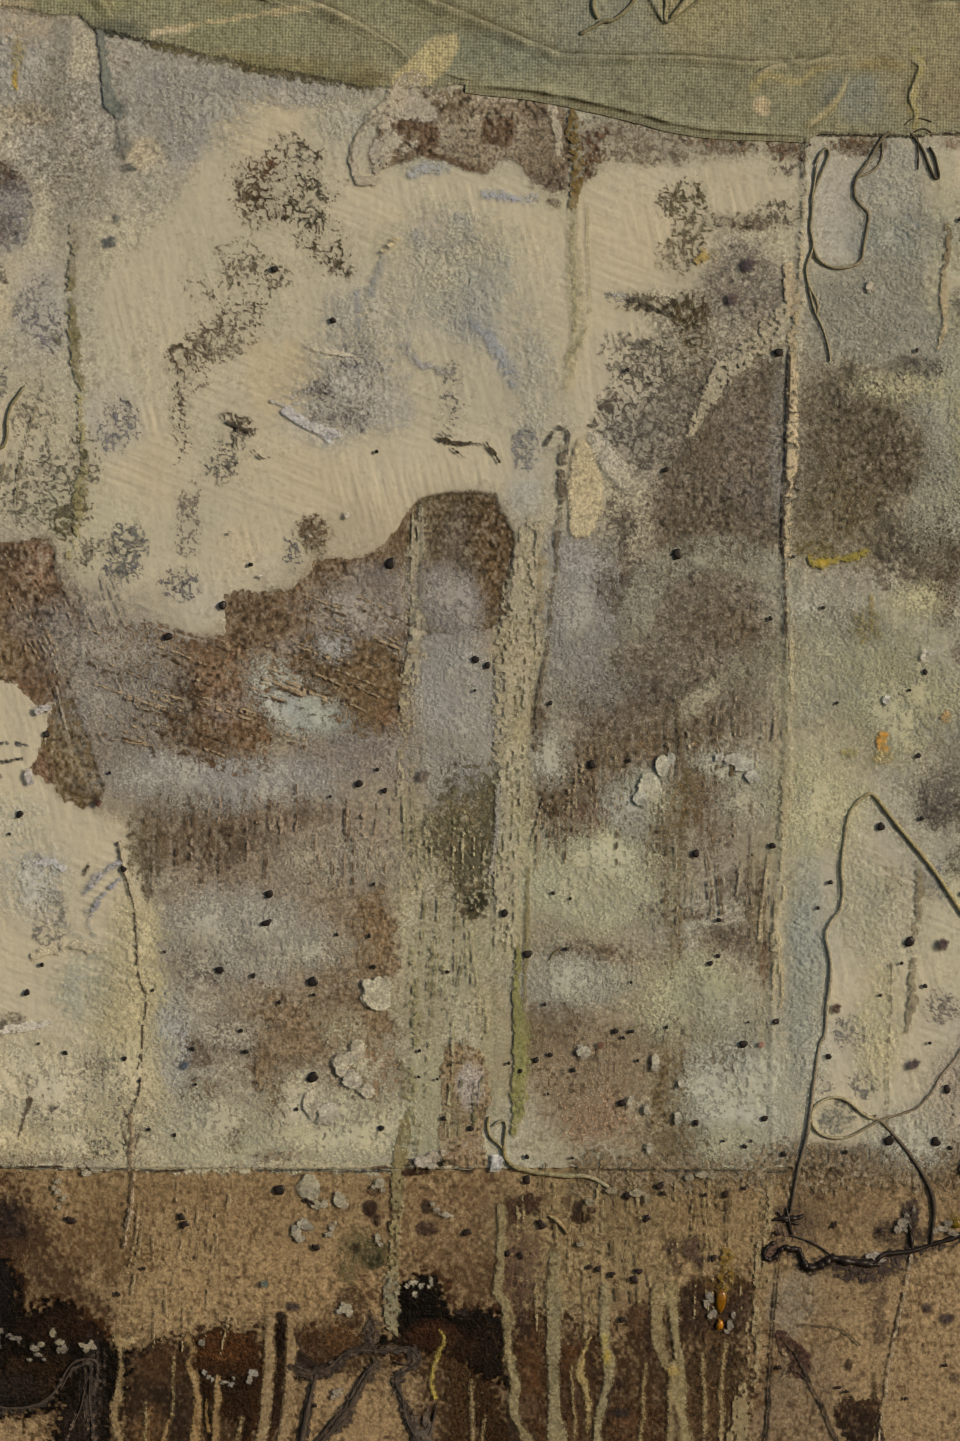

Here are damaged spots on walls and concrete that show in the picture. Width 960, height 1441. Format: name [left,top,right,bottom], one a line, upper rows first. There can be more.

peeling [0,538,129,809]
peeling [224,490,515,718]
water stain [0,1197,136,1441]
water stain [571,1201,597,1224]
water stain [665,1235,707,1272]
water stain [773,1330,812,1382]